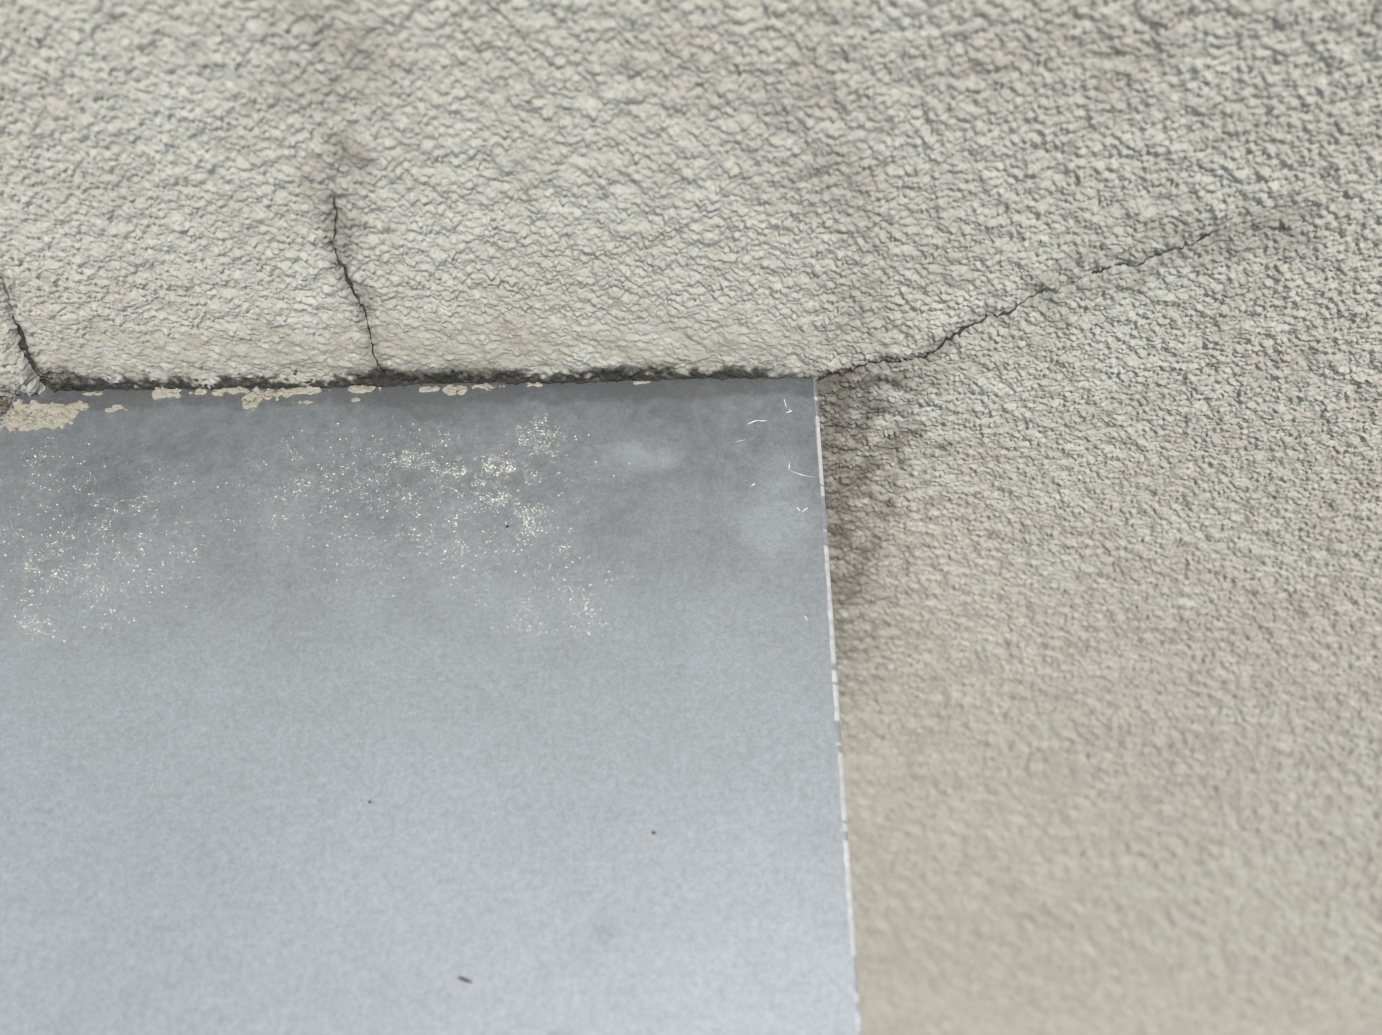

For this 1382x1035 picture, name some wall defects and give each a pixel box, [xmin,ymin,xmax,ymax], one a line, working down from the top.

crack [0,277,47,386]
crack [329,197,386,379]
crack [817,226,1292,382]